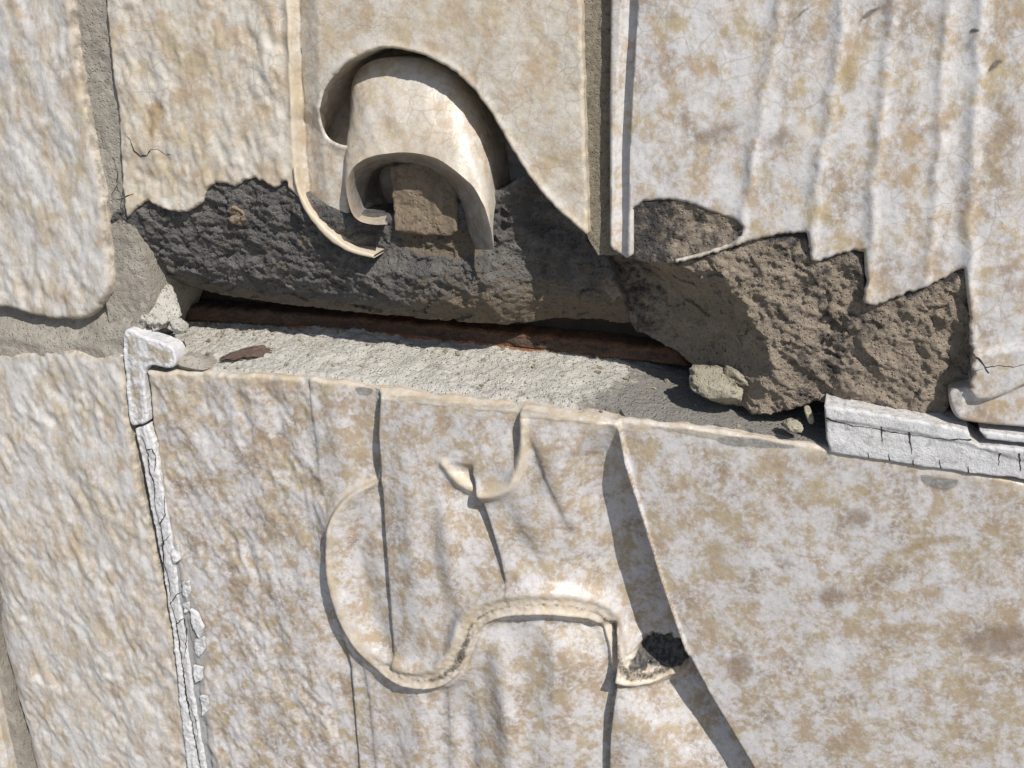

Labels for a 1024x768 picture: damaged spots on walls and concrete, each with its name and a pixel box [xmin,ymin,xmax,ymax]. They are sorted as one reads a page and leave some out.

crack [111,136,171,224]
spalling [110,173,972,415]
rust [459,334,554,353]
crack [825,417,971,469]
crack [142,437,201,768]